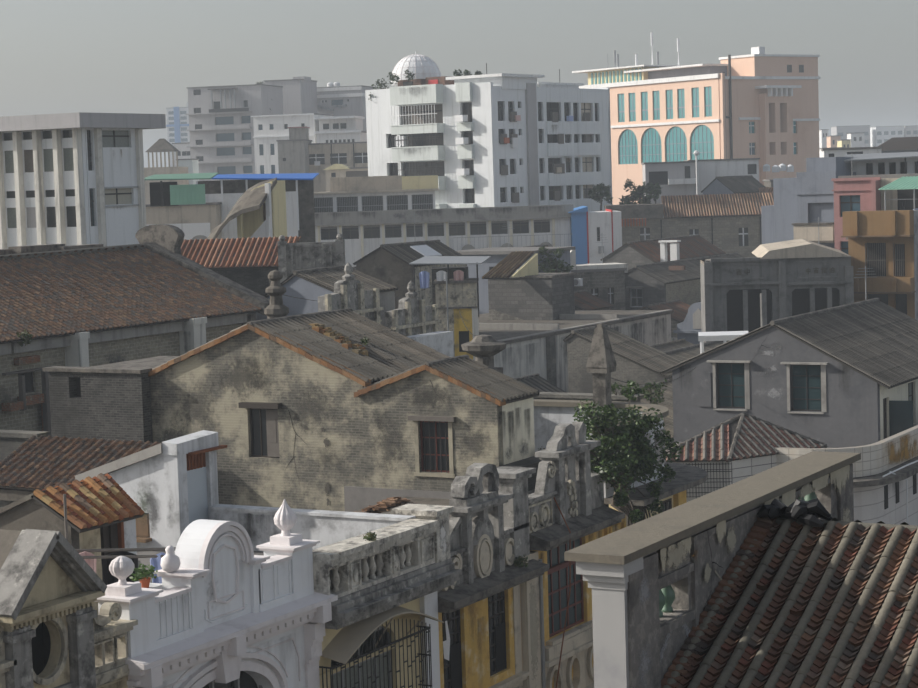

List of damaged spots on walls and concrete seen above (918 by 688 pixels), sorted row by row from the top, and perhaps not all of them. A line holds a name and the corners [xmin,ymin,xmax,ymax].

peeling [716,520,736,552]
peeling [660,537,691,571]